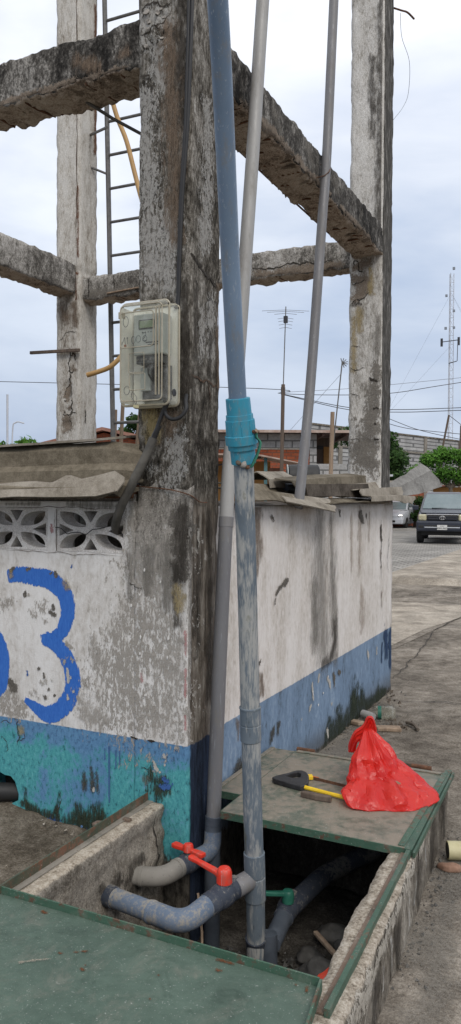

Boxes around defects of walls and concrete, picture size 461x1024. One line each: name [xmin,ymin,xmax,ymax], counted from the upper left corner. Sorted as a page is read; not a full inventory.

spalling [85,82,141,135]
spalling [258,117,373,306]
crack [253,257,369,304]
crack [58,331,86,426]
water stain [126,0,218,705]
peeling [0,495,212,780]
water stain [312,509,341,688]
water stain [381,629,392,668]
water stain [324,678,386,747]
water stain [20,746,120,830]
water stain [143,765,171,803]